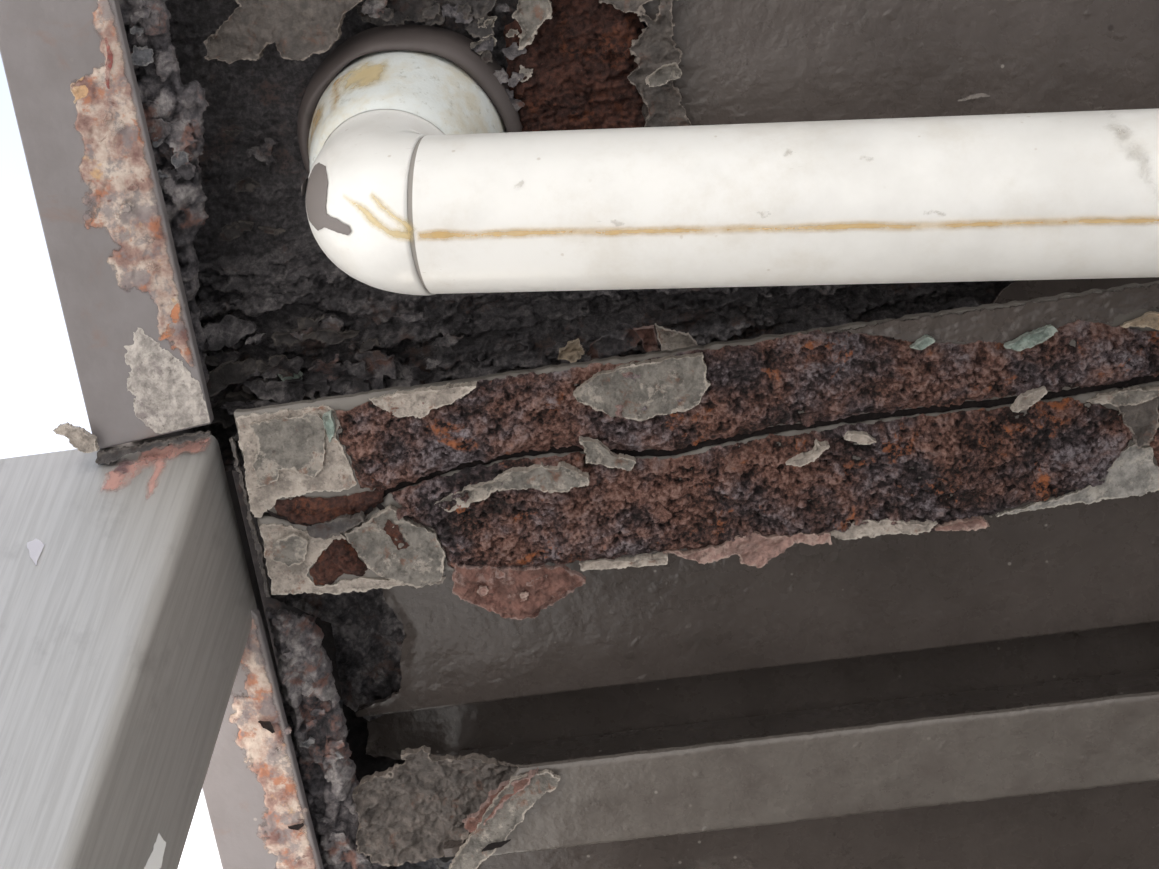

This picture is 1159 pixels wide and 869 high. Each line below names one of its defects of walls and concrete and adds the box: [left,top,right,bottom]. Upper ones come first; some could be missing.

peeling [203,0,497,64]
peeling [599,0,692,127]
corrosion [70,0,1159,620]
crack [267,509,314,526]
peeling [306,504,446,589]
peeling [369,381,477,418]
peeling [435,436,636,512]
peeling [573,323,710,421]
crack [352,375,1159,515]
corrosion [229,607,396,869]
peeling [352,745,561,869]
corrosion [462,767,538,833]